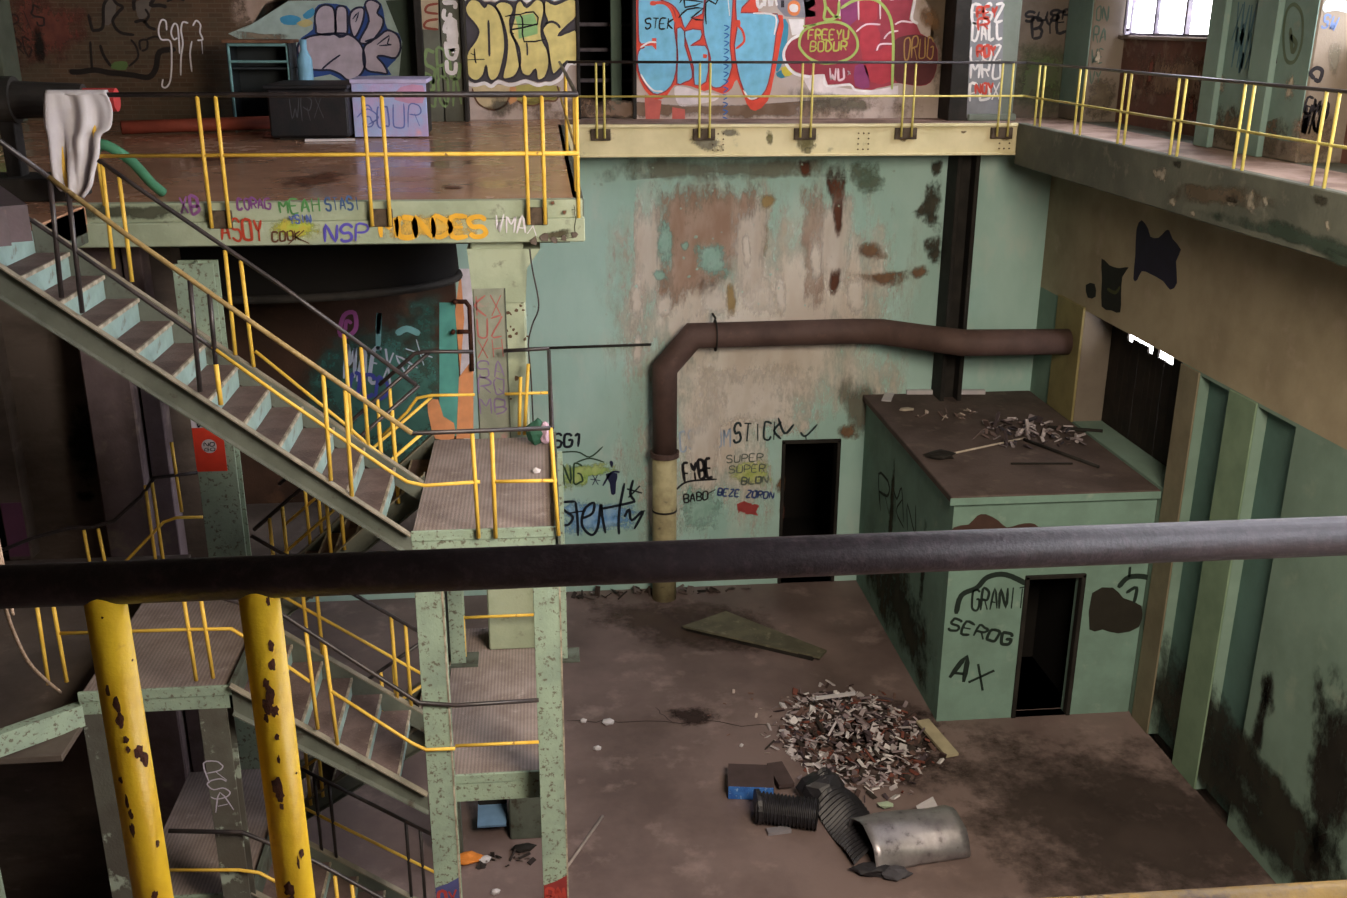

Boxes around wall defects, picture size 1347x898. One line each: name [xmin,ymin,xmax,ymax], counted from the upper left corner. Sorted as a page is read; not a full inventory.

peeling [630,164,757,362]
peeling [799,190,871,314]
rust [105,685,148,767]
rust [262,640,297,810]
damp [1250,686,1268,755]
rust [118,777,135,838]
rust [284,849,304,898]